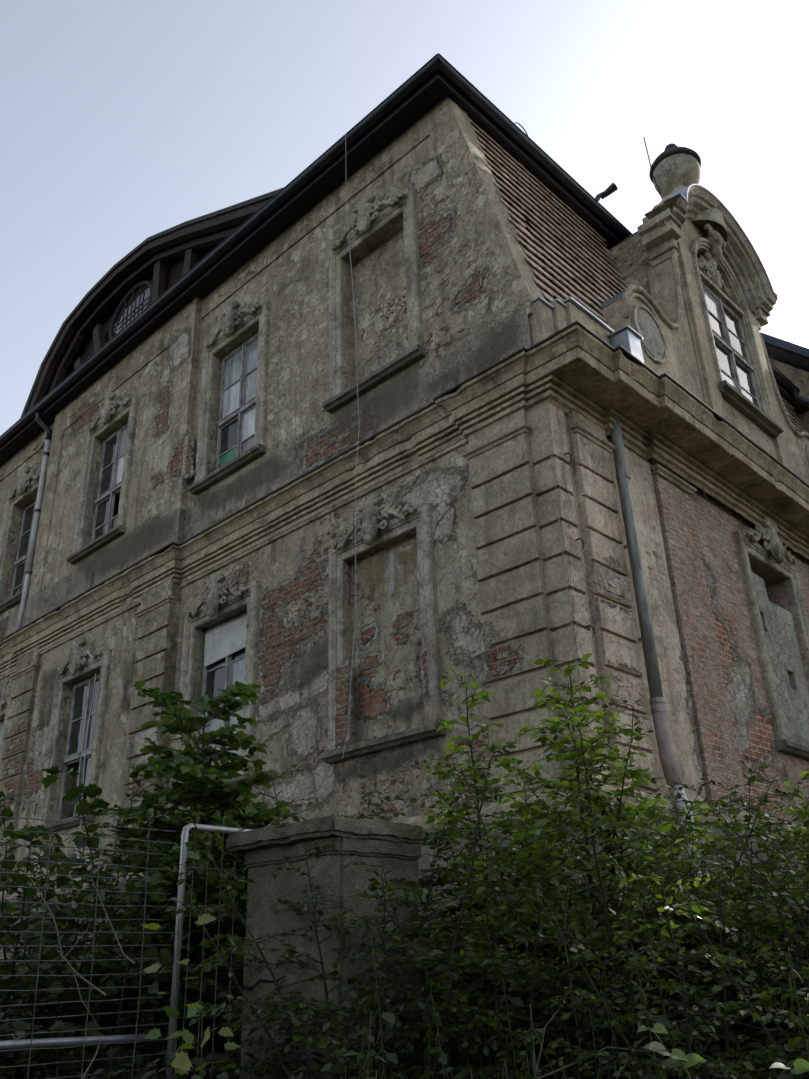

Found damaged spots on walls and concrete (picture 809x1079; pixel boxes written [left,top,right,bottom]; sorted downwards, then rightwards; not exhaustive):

spalling [418,204,458,269]
spalling [150,327,196,490]
spalling [301,402,383,474]
peeling [645,526,678,625]
peeling [256,553,414,818]
peeling [419,599,528,702]
spalling [679,639,705,778]
spalling [701,552,786,817]